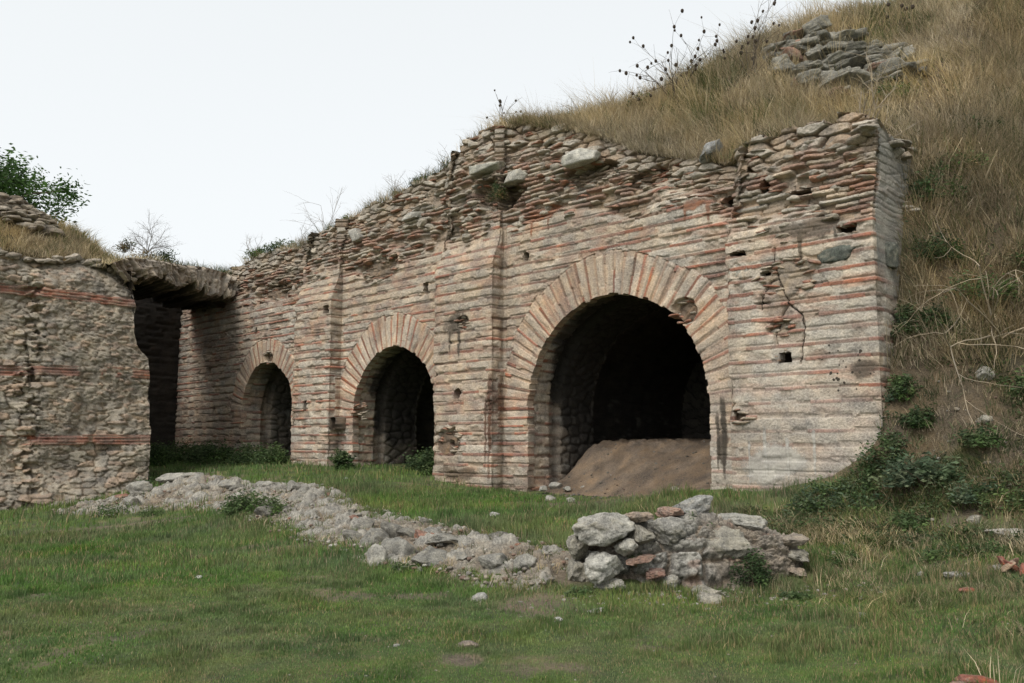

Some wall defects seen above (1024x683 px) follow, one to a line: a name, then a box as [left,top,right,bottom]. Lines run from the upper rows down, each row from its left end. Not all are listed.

spalling [668,299,698,325]
crack [759,249,806,363]
water stain [715,399,728,472]